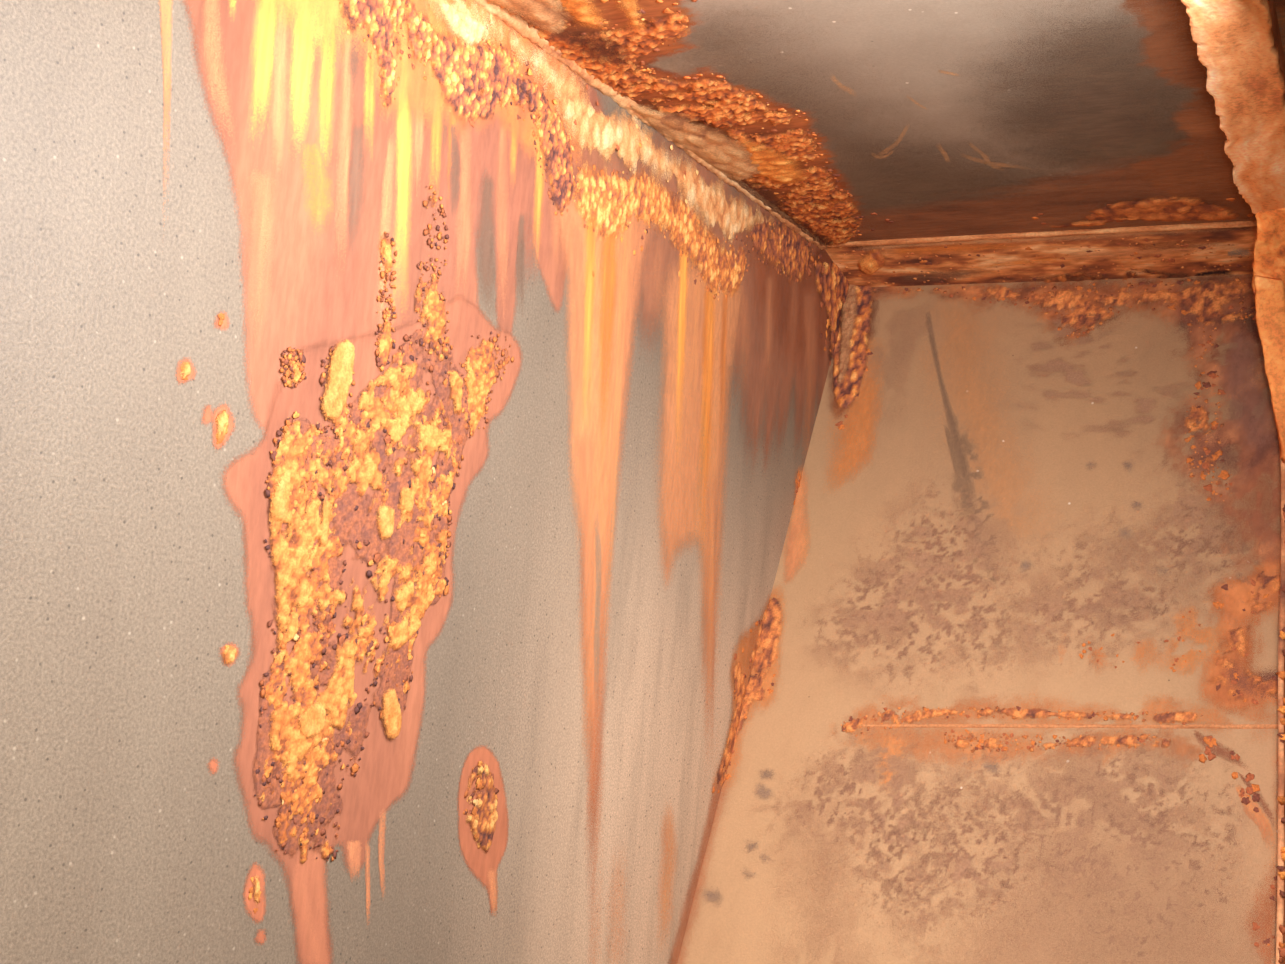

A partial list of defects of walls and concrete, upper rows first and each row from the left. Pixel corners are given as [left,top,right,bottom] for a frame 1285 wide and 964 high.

rust [159,0,173,187]
rust [175,357,198,385]
rust [180,0,750,964]
rust [668,465,812,964]
rust [500,0,1281,793]
rust [1239,781,1278,964]